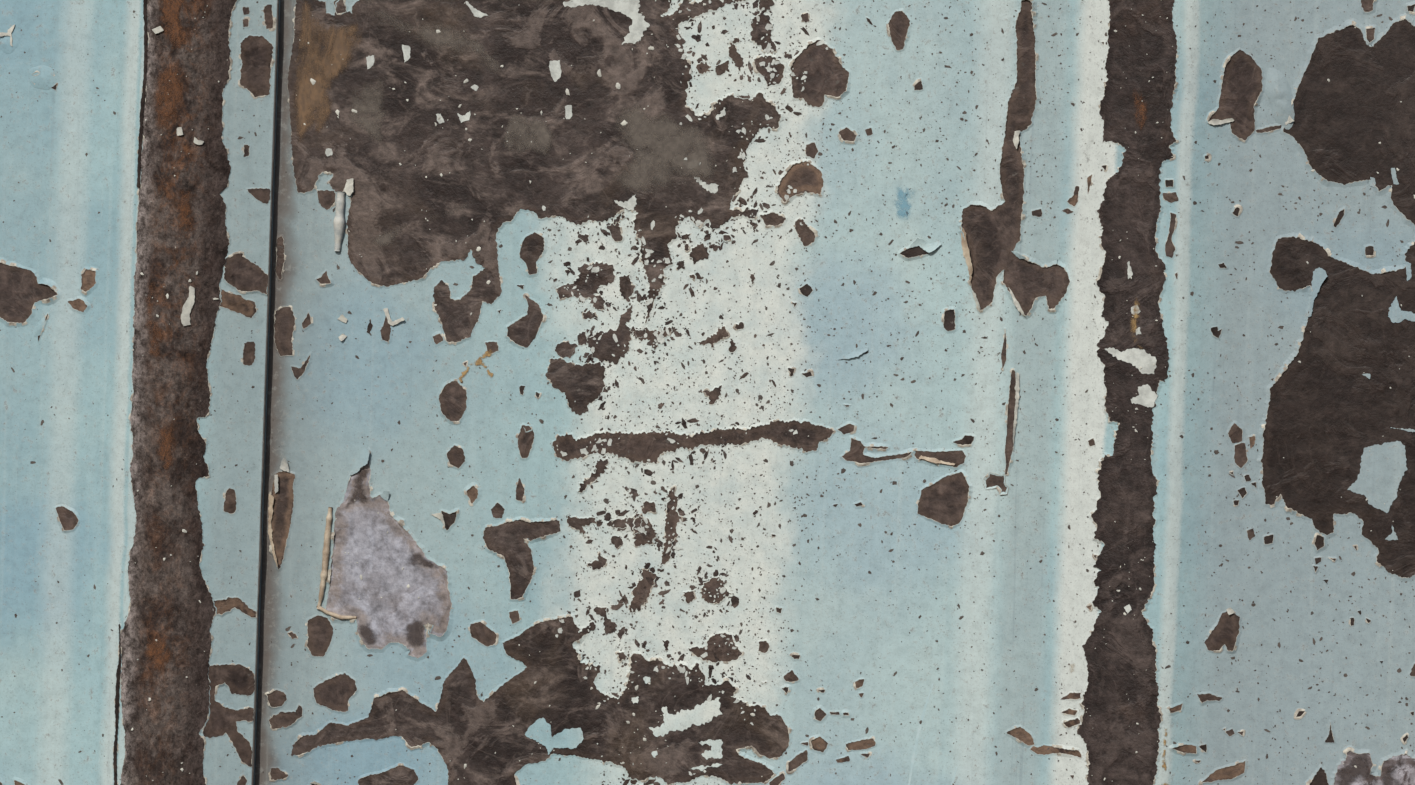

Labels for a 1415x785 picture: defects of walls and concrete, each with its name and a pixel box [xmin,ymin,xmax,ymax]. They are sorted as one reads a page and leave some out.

peeling [1030,207,1044,219]
peeling [1061,164,1108,215]
peeling [0,257,100,328]
peeling [1205,0,1415,585]
rust [117,0,240,785]
peeling [201,0,878,785]
peeling [951,433,977,449]
peeling [915,469,973,530]
peeling [1304,710,1415,785]